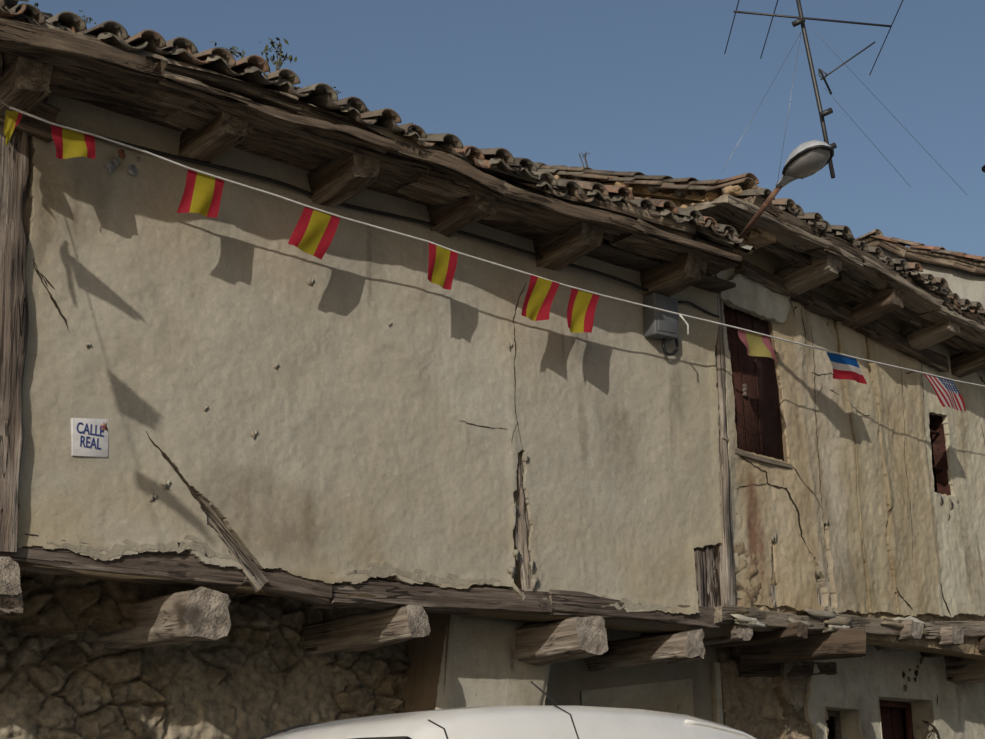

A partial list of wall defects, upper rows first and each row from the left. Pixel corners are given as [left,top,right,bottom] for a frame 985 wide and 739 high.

crack [33,259,70,333]
spalling [46,431,268,593]
crack [464,284,526,450]
crack [737,296,869,557]
crack [888,354,930,563]